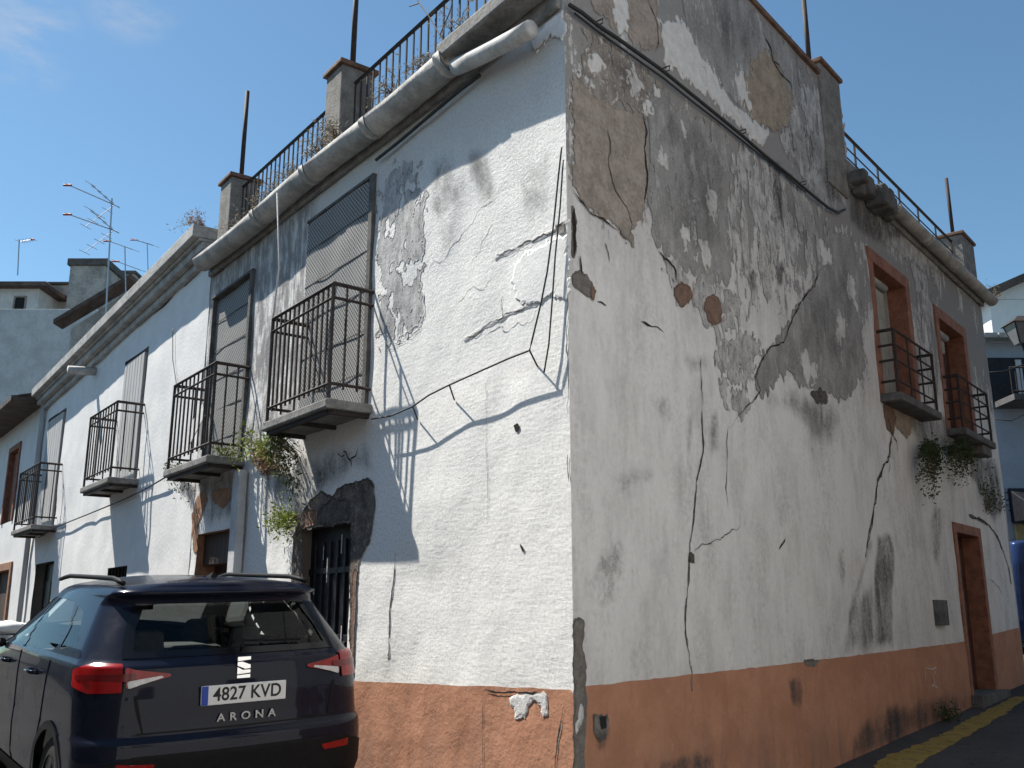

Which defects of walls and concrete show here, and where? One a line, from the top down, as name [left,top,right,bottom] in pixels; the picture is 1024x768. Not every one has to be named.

peeling [374,158,429,351]
crack [463,296,540,342]
crack [494,206,577,416]
peeling [569,0,865,427]
spalling [191,487,230,553]
spalling [291,477,375,663]
crack [386,552,396,659]
crack [685,360,743,692]
damp [863,537,892,644]
crack [865,419,898,557]
peeling [484,690,548,719]
spalling [572,617,609,768]